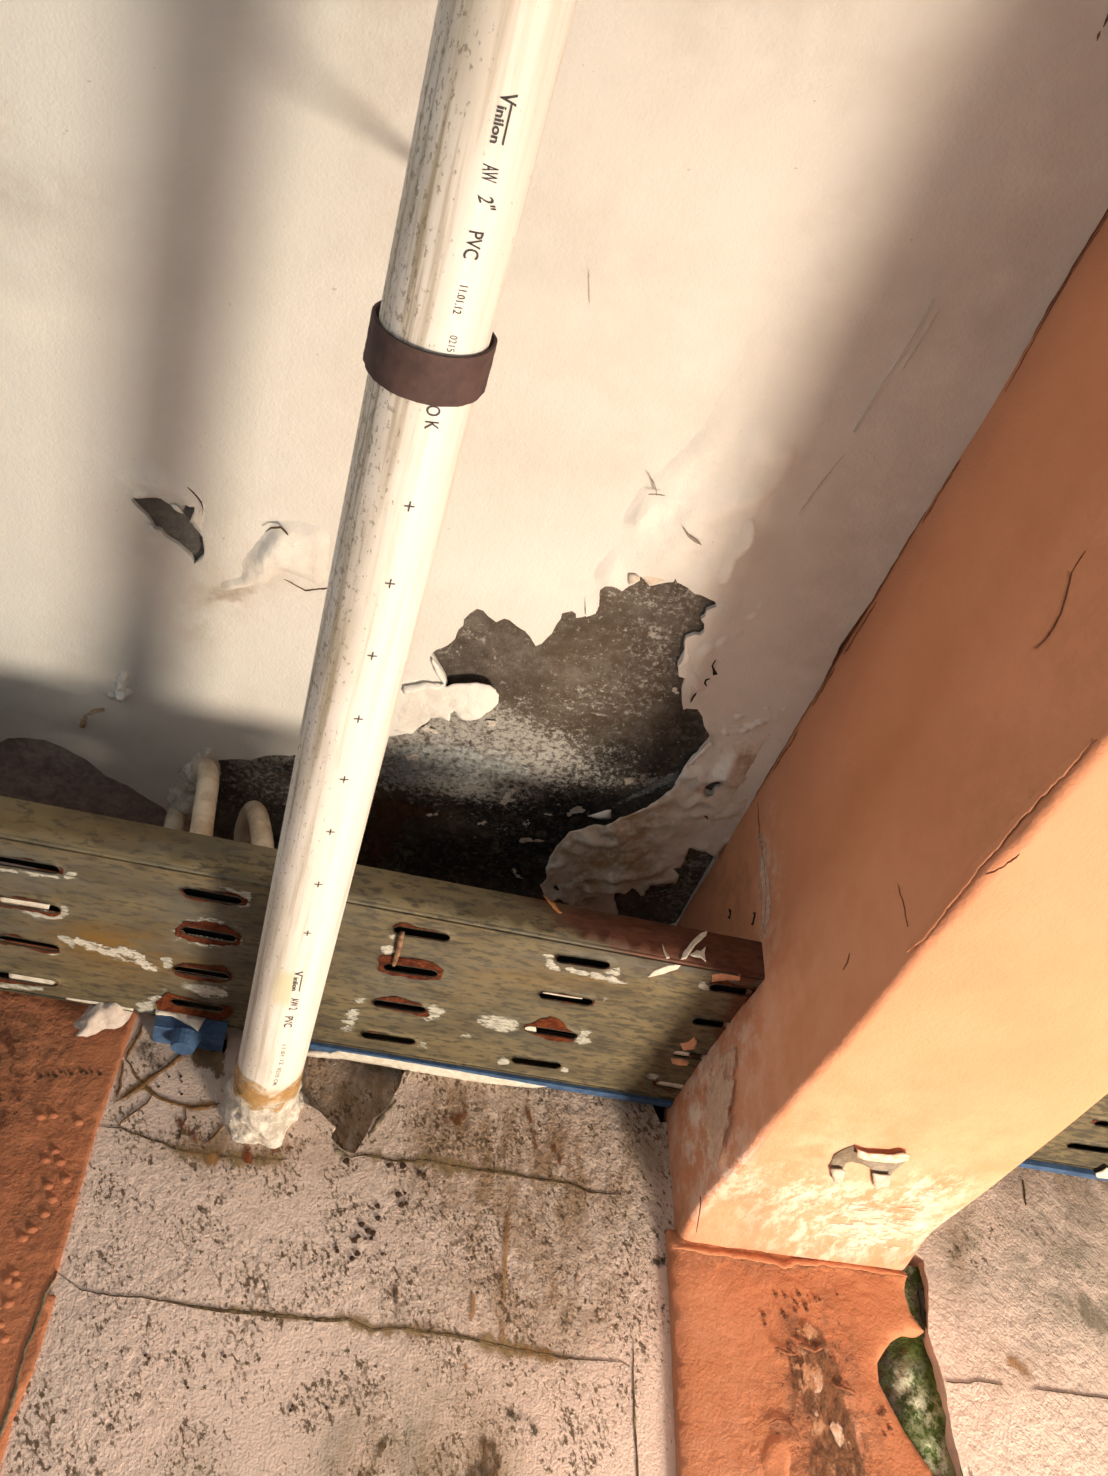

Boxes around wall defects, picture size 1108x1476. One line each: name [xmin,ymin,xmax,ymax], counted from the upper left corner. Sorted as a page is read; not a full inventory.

spalling [134,498,204,561]
spalling [213,755,295,849]
rust [361,799,432,868]
water stain [384,739,532,788]
spalling [356,574,788,924]
crack [897,738,1098,953]
rust [0,896,232,1021]
rust [462,954,627,1044]
water stain [137,1042,305,1112]
crack [344,1152,619,1195]
water stain [334,1191,409,1261]
crack [0,1272,639,1476]